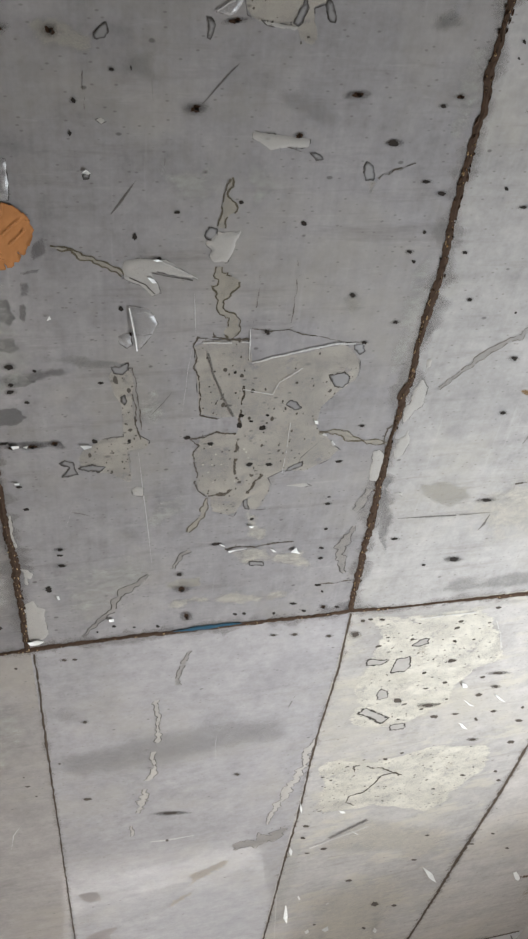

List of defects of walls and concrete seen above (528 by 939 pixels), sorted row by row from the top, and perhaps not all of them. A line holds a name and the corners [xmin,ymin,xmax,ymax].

peeling [122,257,198,296]
leakage [0,238,128,394]
crack [438,327,528,390]
leakage [0,408,27,426]
leakage [0,441,65,449]
peeling [59,362,150,497]
peeling [349,606,511,731]
peeling [313,737,501,814]